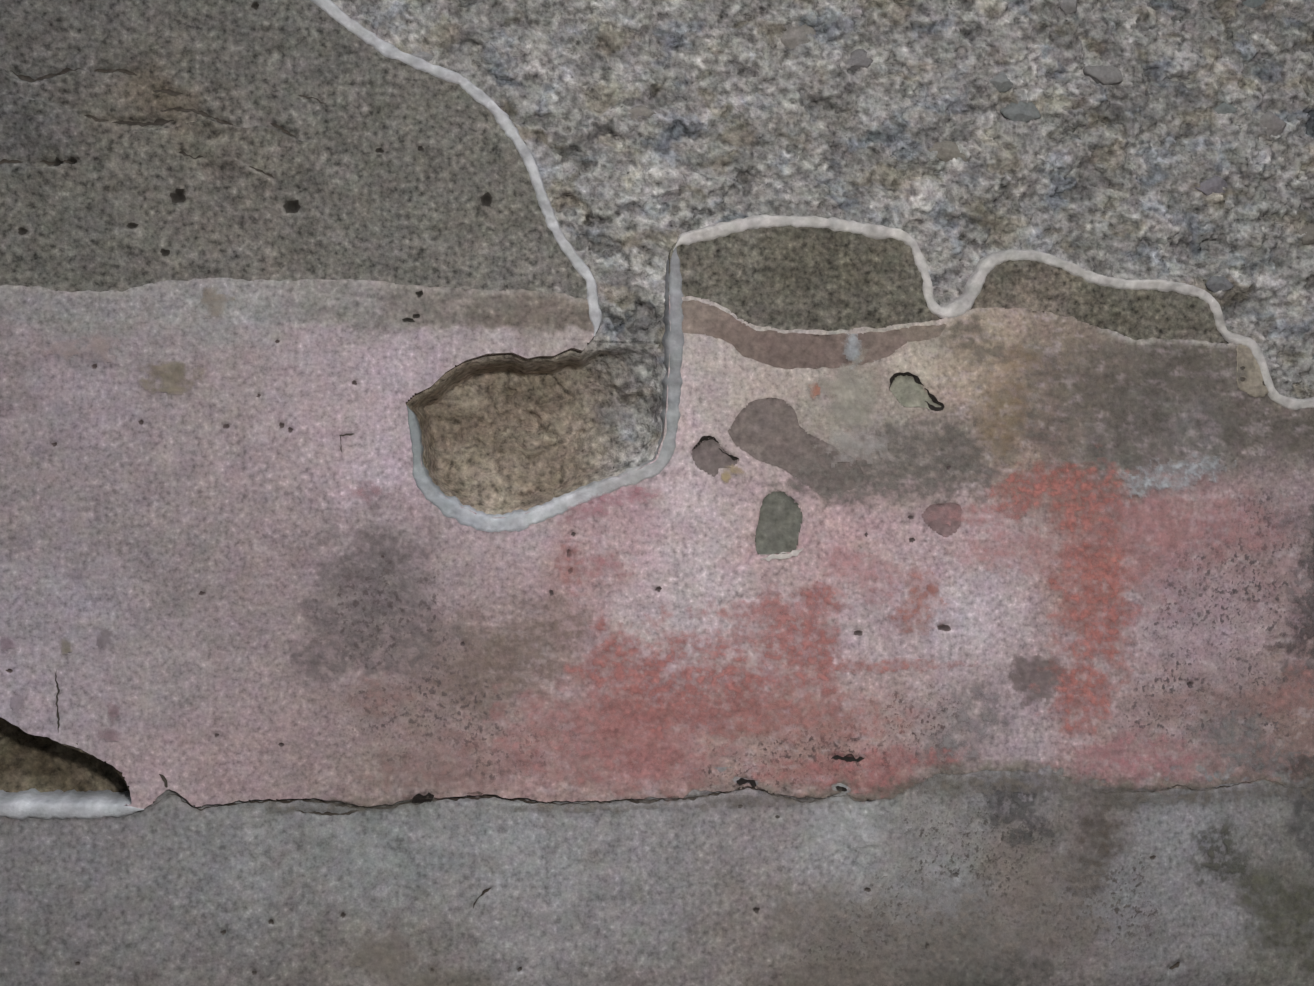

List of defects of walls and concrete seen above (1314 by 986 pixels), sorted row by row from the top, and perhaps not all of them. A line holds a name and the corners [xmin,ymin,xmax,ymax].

crack [10,67,235,127]
crack [270,123,296,137]
crack [0,158,73,166]
spalling [170,189,186,203]
spalling [283,200,301,213]
spalling [331,0,1314,399]
flaking render [889,372,944,411]
flaking render [691,398,864,494]
flaking render [755,491,804,561]
water stain [1015,343,1314,853]
crack [151,774,863,816]
crack [1095,778,1305,794]